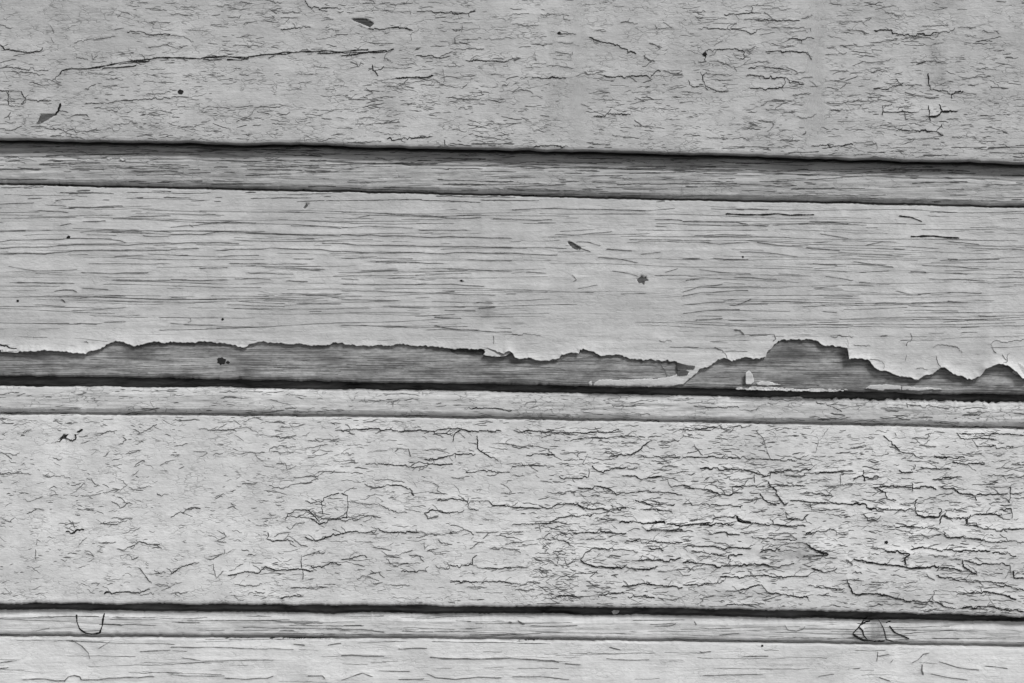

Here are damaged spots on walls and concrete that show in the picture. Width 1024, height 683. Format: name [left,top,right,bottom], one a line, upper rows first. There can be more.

crack [0,0,1024,370]
peeling [0,339,1024,395]
crack [0,364,1024,683]